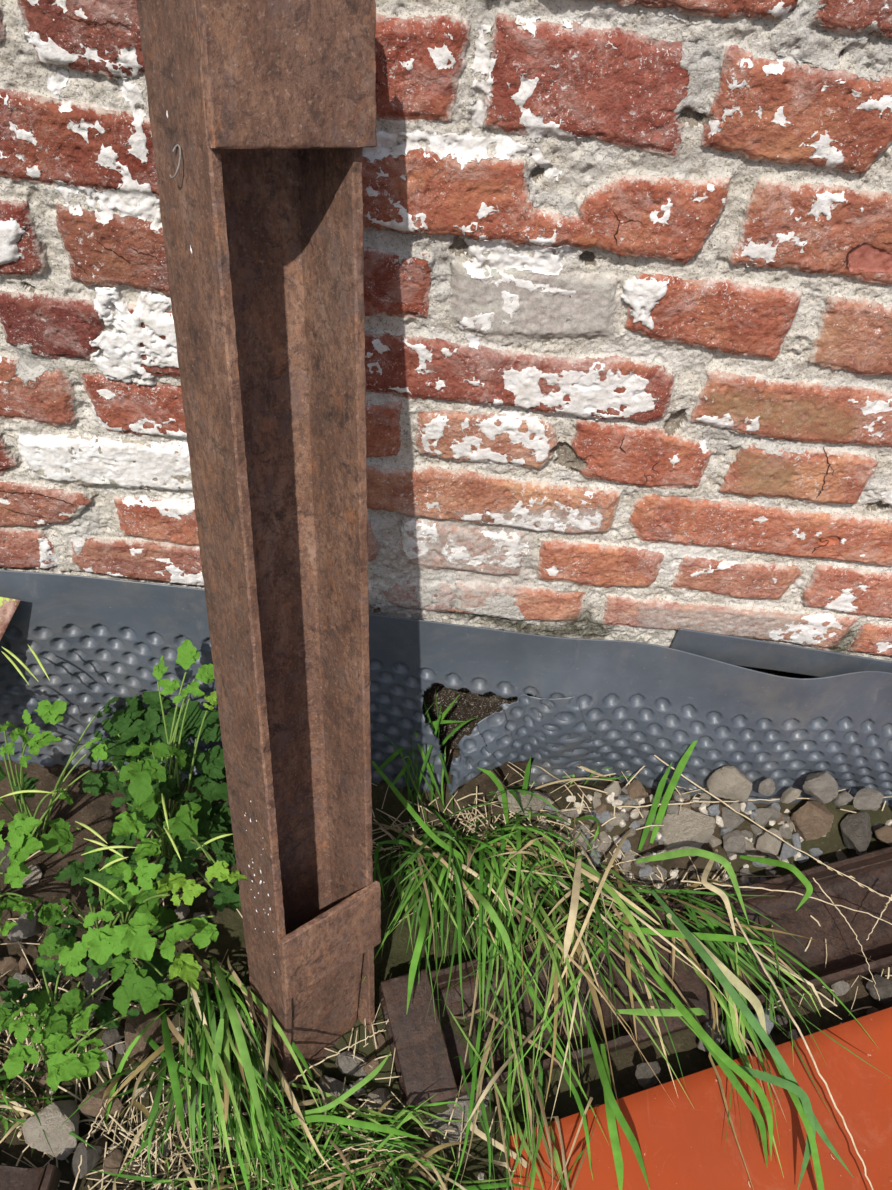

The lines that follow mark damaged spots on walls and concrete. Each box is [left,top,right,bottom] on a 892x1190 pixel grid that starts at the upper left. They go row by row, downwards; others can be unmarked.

peeling [27,0,88,19]
peeling [515,13,541,38]
crack [639,0,707,12]
crack [846,242,892,270]
peeling [365,339,390,375]
peeling [17,286,195,520]
peeling [417,362,659,466]
crack [816,447,834,499]